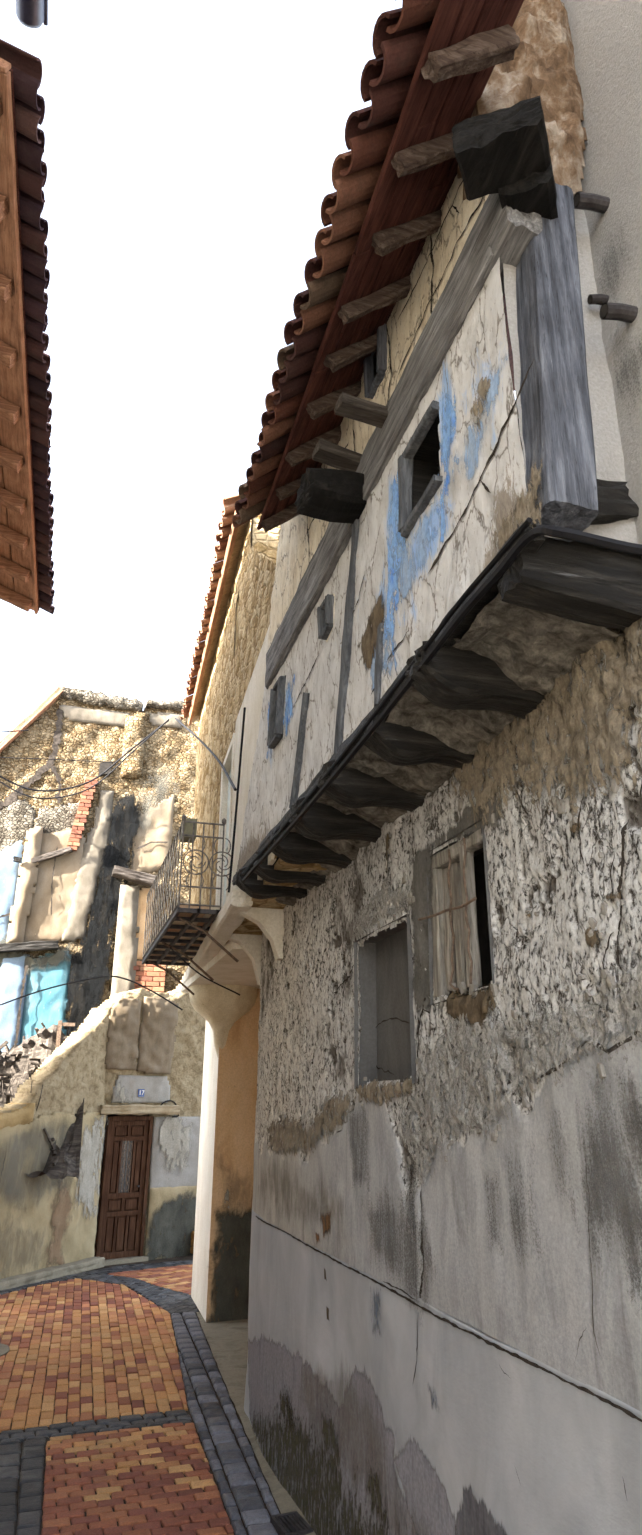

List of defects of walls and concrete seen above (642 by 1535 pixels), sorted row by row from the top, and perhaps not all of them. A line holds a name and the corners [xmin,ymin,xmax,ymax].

peeling [357,369,499,689]
crack [429,362,533,572]
flaking render [585,891,625,949]
crack [333,965,354,1048]
flaking render [266,959,642,1197]
peeling [46,1115,108,1266]
water stain [146,1192,196,1260]
water stain [207,1209,252,1323]
crack [256,998,642,1422]
water stain [552,1073,642,1298]
water stain [280,1385,294,1425]
water stain [368,1464,385,1525]